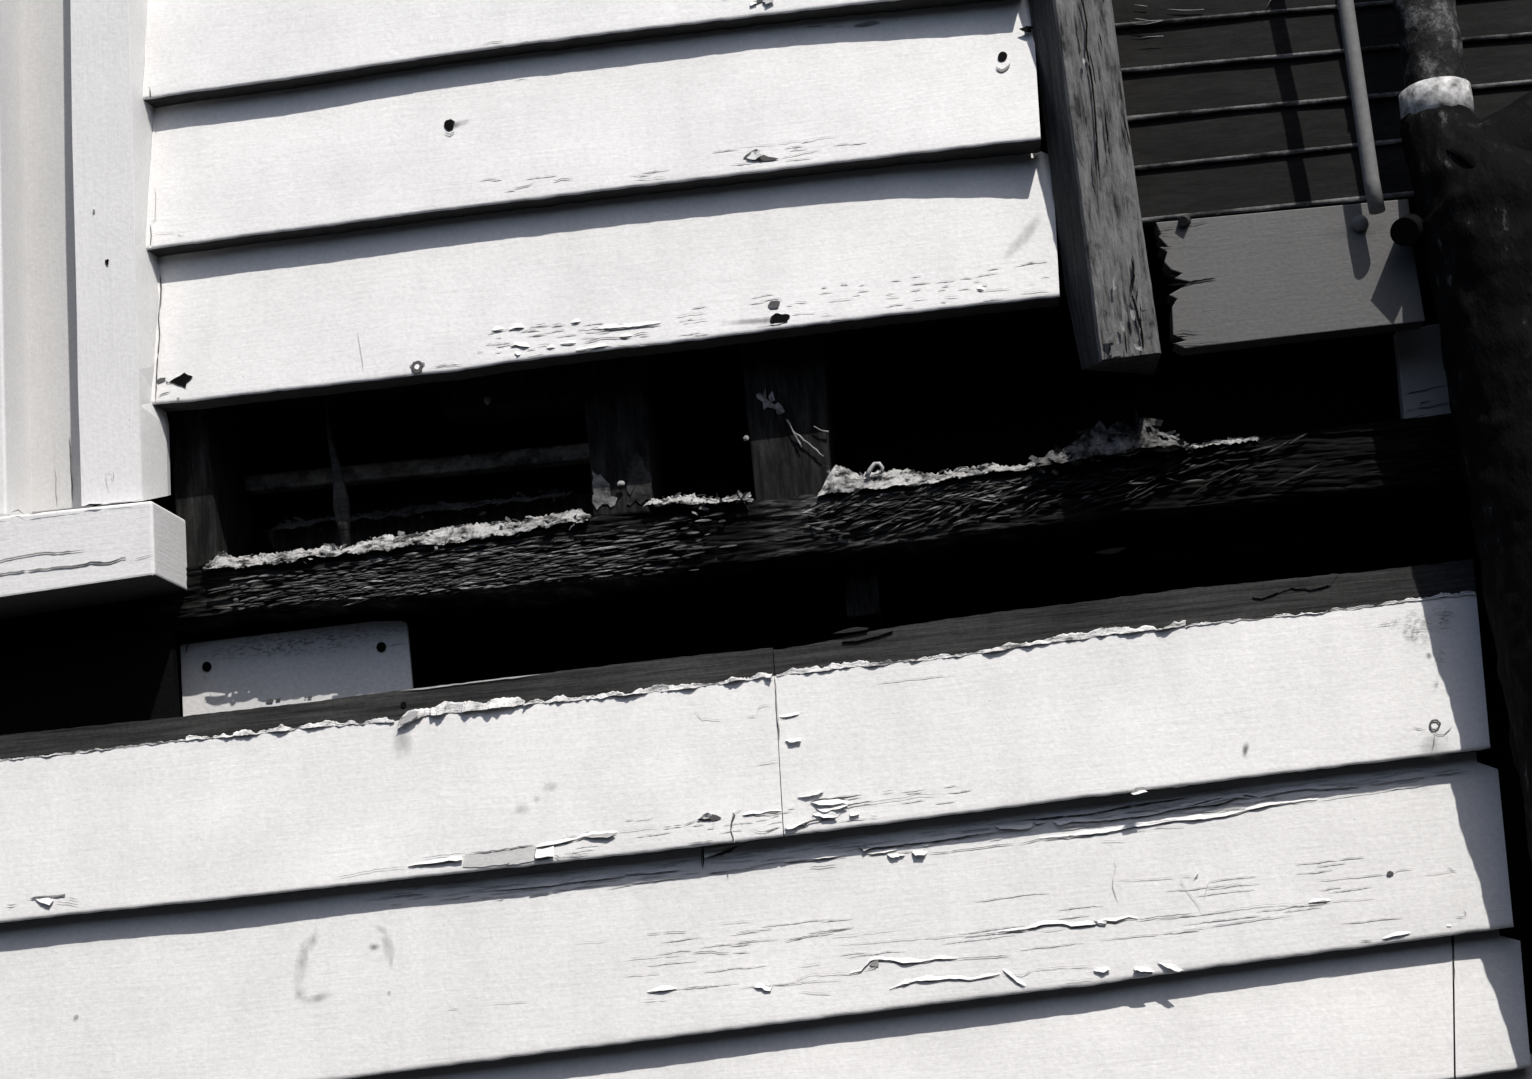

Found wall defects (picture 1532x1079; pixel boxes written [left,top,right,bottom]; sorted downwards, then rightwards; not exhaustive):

crack [0,439,153,575]
peeling [1252,574,1338,599]
peeling [0,590,1475,761]
peeling [1131,786,1183,795]
peeling [685,813,721,825]
peeling [786,789,934,829]
peeling [339,845,587,877]
peeling [688,840,742,858]
peeling [9,894,77,908]